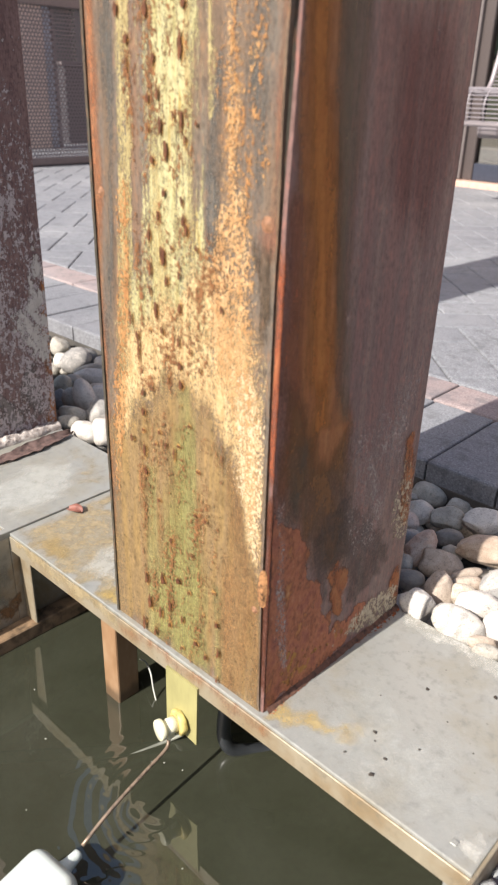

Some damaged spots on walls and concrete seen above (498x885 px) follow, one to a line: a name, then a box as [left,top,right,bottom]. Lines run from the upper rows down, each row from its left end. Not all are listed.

corrosion [85,0,102,246]
corrosion [41,279,57,422]
corrosion [112,0,228,666]
corrosion [399,432,416,523]
corrosion [349,566,400,649]
corrosion [270,702,357,743]